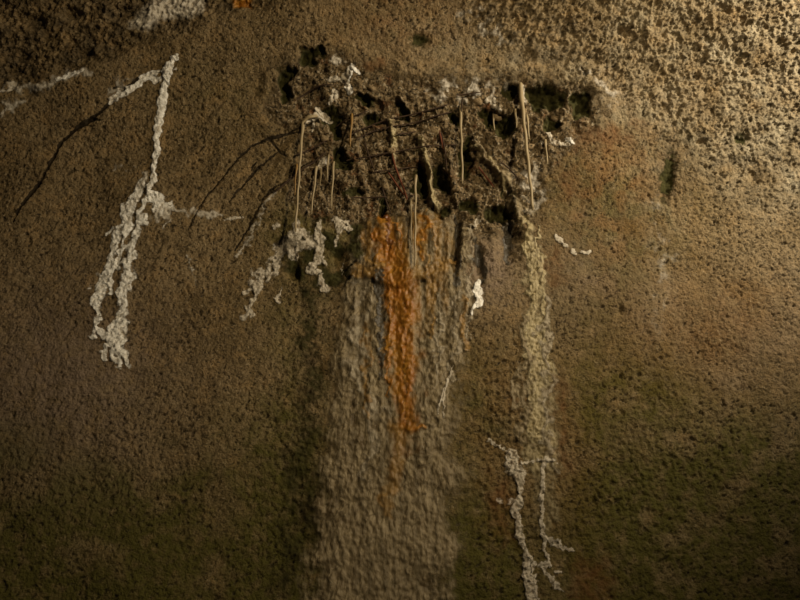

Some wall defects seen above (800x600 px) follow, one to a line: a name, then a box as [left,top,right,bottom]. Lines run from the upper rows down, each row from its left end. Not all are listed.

damp [0,68,93,117]
crack [13,70,161,223]
damp [88,53,244,369]
damp [131,0,204,28]
crack [188,123,317,250]
damp [235,193,275,257]
spalling [265,45,604,240]
damp [555,234,591,255]
damp [240,216,392,600]
rust [359,210,448,516]
damp [400,214,488,600]
damp [486,225,575,600]